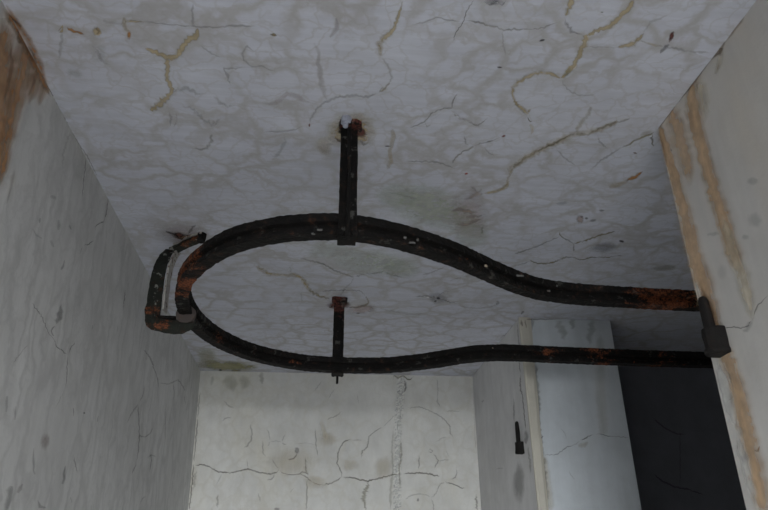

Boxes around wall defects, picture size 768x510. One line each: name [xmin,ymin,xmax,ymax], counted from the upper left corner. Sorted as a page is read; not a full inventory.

corrosion [0,15,49,175]
crack [146,29,199,111]
crack [379,8,401,49]
crack [512,1,633,105]
crack [619,35,642,48]
crack [532,231,621,264]
crack [189,420,277,508]
crack [325,440,477,501]